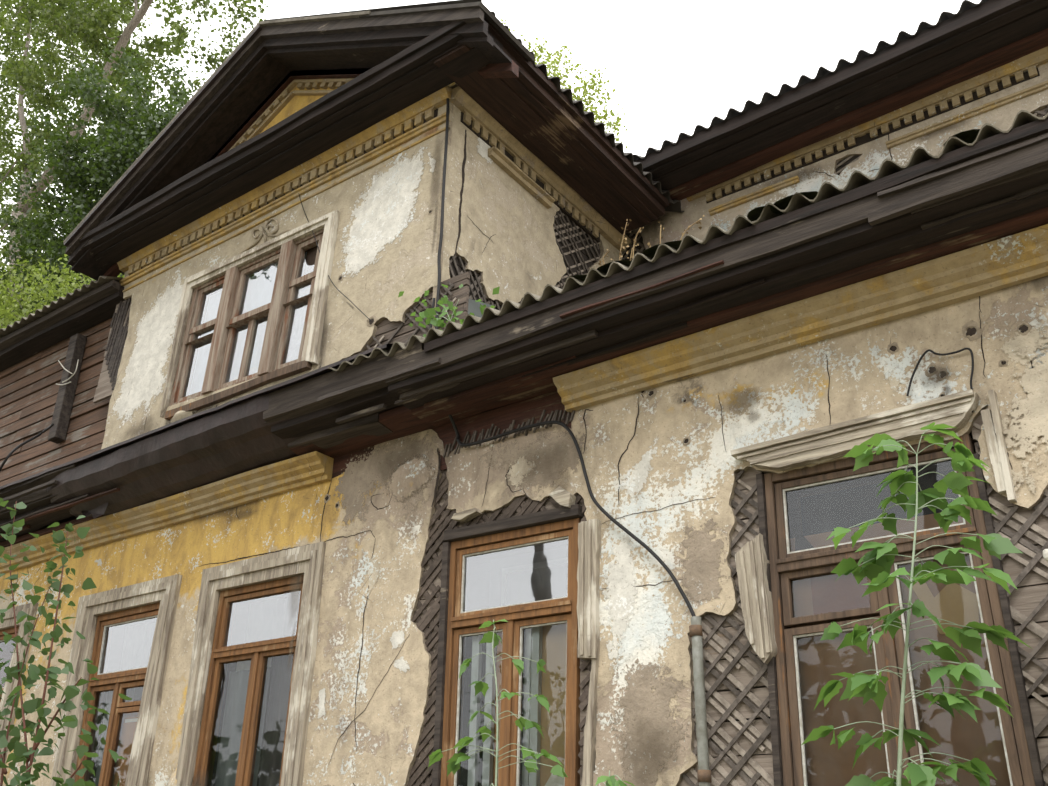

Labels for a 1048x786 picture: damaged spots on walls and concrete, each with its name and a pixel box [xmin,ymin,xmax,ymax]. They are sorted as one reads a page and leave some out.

spalling [366,255,503,350]
crack [455,129,496,255]
spalling [553,210,601,289]
spalling [622,233,646,261]
spalling [925,362,949,397]
spalling [971,407,988,455]
crack [199,479,393,567]
crack [328,585,410,765]
spalling [324,429,587,786]
spalling [577,658,596,786]
spalling [602,468,774,786]
spalling [984,322,1048,786]